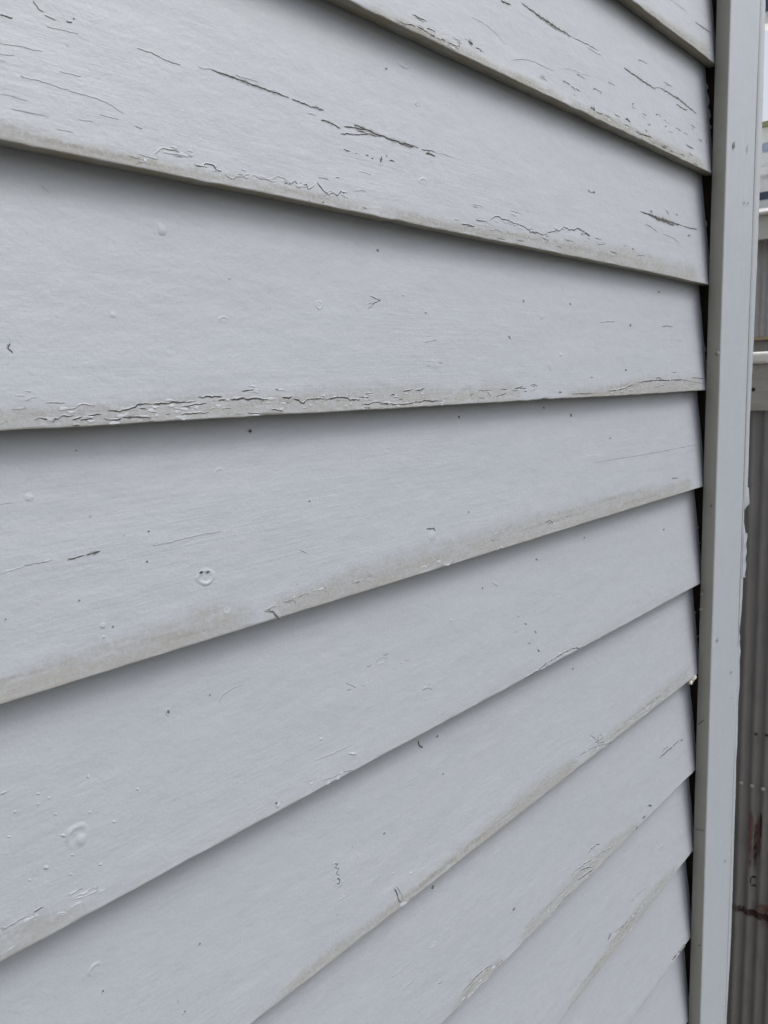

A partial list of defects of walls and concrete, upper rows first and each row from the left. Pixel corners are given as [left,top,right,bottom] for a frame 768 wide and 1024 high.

peeling [396,20,463,49]
peeling [130,146,348,208]
peeling [454,204,644,259]
peeling [34,385,444,426]